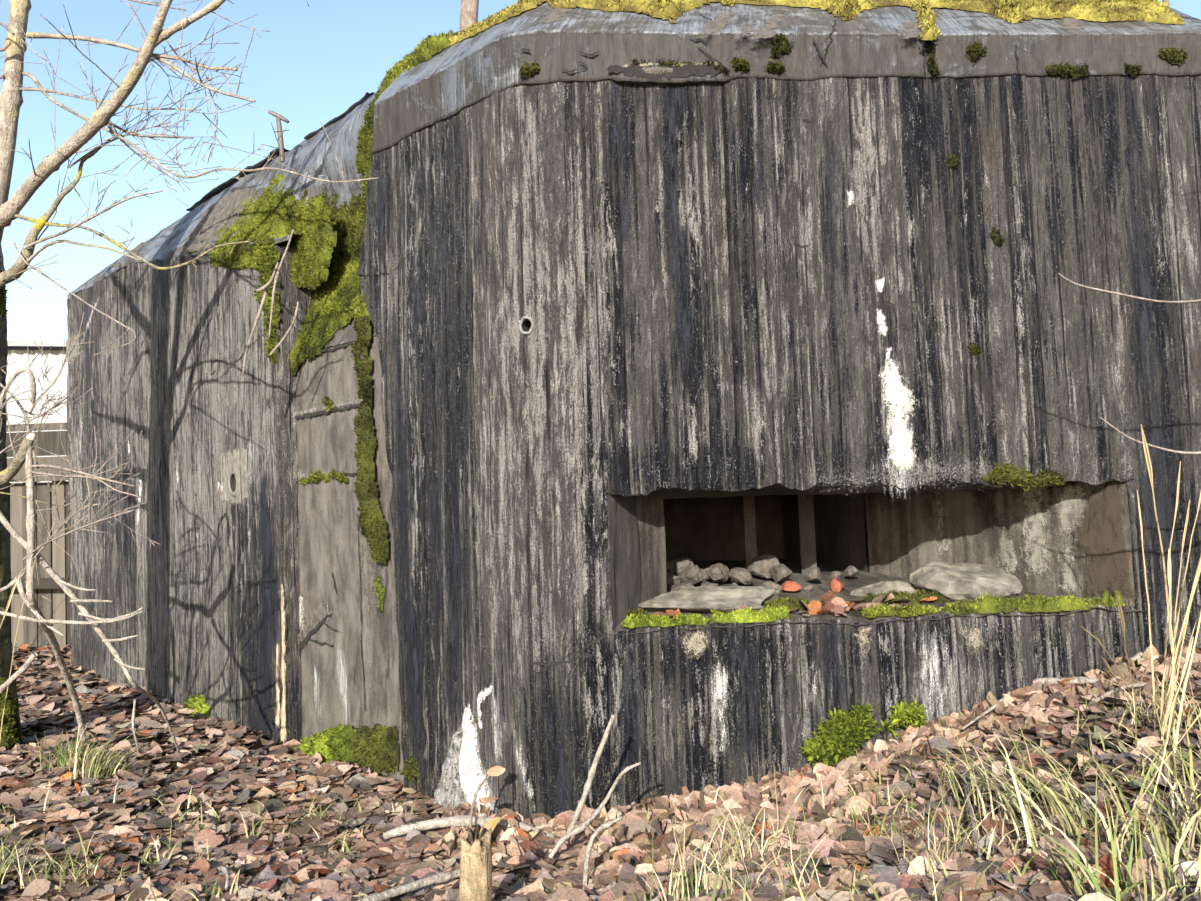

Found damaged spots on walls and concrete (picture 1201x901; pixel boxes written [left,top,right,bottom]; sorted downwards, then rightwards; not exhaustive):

leakage [877,309,921,492]
leakage [933,492,951,555]
leakage [998,482,1089,593]